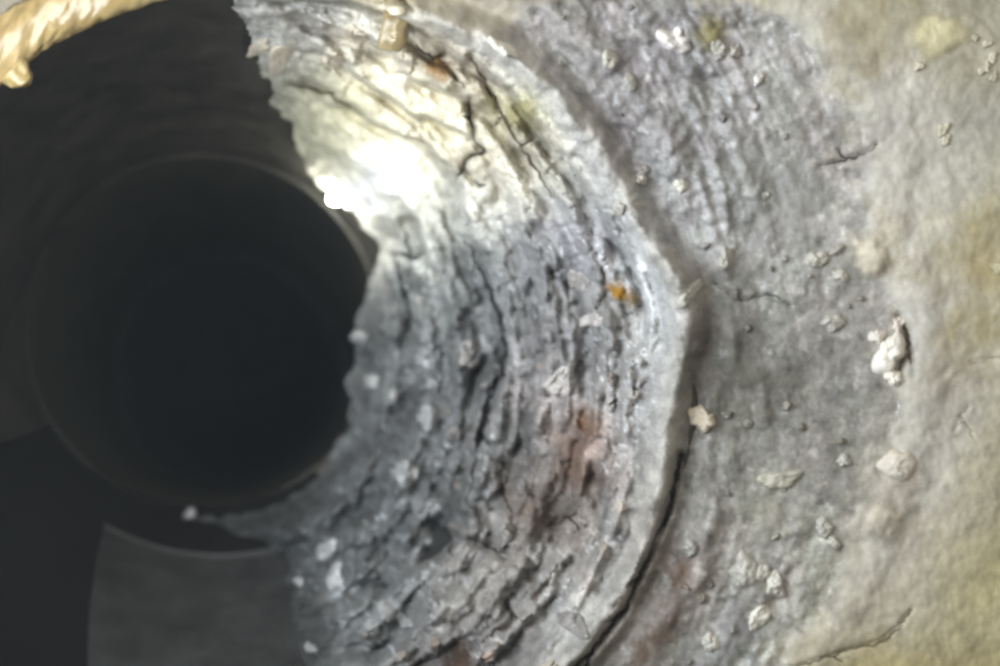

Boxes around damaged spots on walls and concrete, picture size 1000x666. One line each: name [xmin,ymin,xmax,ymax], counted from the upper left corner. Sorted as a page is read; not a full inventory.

crack [415,45,552,199]
corrosion [608,285,637,303]
spalling [469,0,916,666]
crack [554,512,579,533]
crack [576,454,680,666]
crack [483,562,558,642]
crack [798,609,911,666]